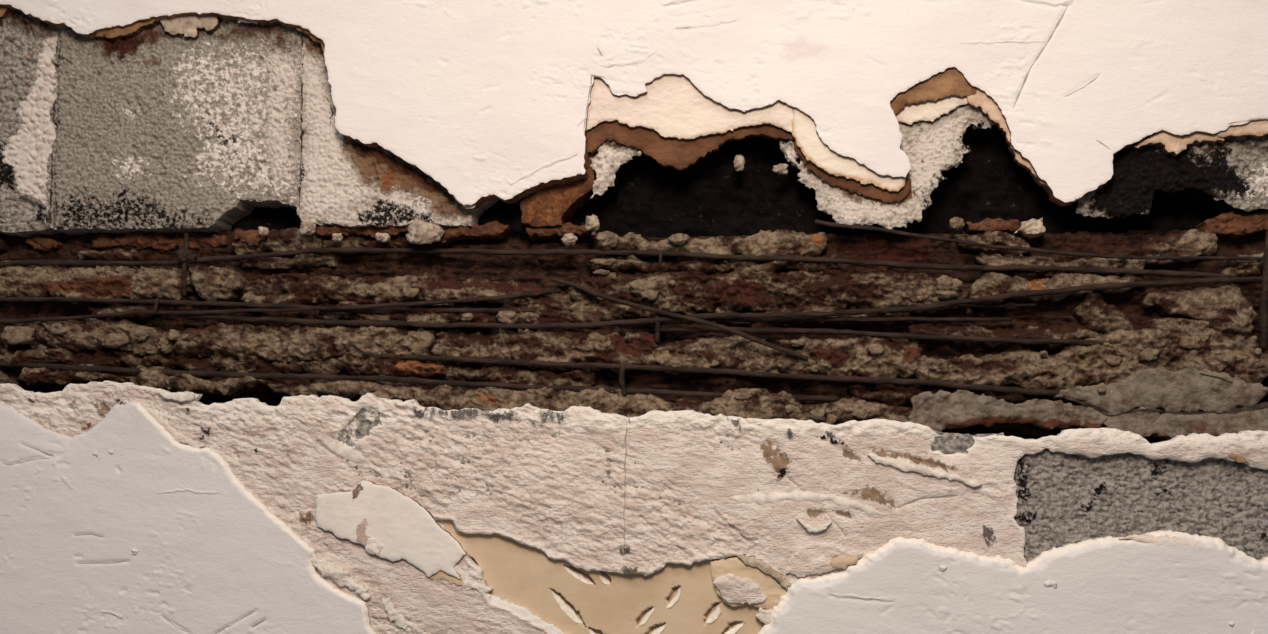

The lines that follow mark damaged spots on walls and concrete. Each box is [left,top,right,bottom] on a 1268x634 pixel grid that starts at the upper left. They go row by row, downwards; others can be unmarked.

flaking render [0,5,11,19]
flaking render [87,15,220,40]
flaking render [296,27,325,55]
flaking render [586,75,912,204]
flaking render [890,69,1047,188]
flaking render [1133,119,1268,157]
spalling [0,227,1268,440]
flaking render [868,454,982,487]
flaking render [311,480,595,634]
flaking render [564,565,610,585]
flaking render [705,517,862,634]
flaking render [1119,534,1206,546]